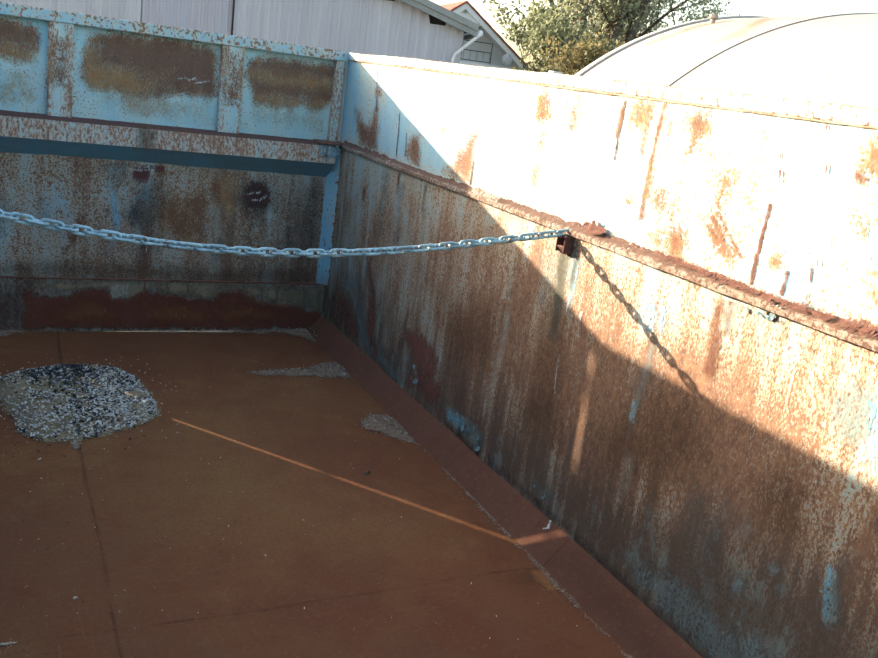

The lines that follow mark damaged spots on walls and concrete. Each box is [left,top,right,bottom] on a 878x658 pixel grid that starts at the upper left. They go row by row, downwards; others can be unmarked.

corrosion [0,16,334,125]
corrosion [127,165,164,183]
corrosion [150,186,215,252]
corrosion [244,180,271,210]
corrosion [404,134,422,166]
corrosion [442,127,479,184]
corrosion [529,86,593,190]
corrosion [616,98,721,261]
corrosion [710,151,751,214]
corrosion [847,129,878,198]
corrosion [21,288,321,331]
corrosion [701,300,723,380]